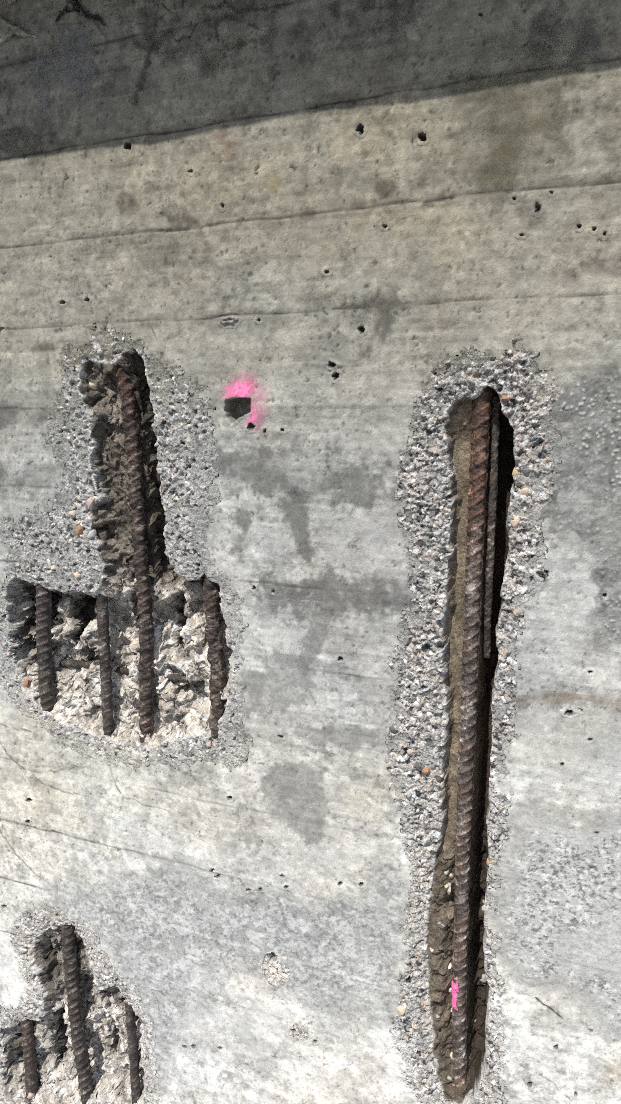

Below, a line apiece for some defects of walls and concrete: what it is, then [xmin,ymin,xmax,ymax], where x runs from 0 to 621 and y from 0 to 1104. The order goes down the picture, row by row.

spalling [0,320,621,1104]